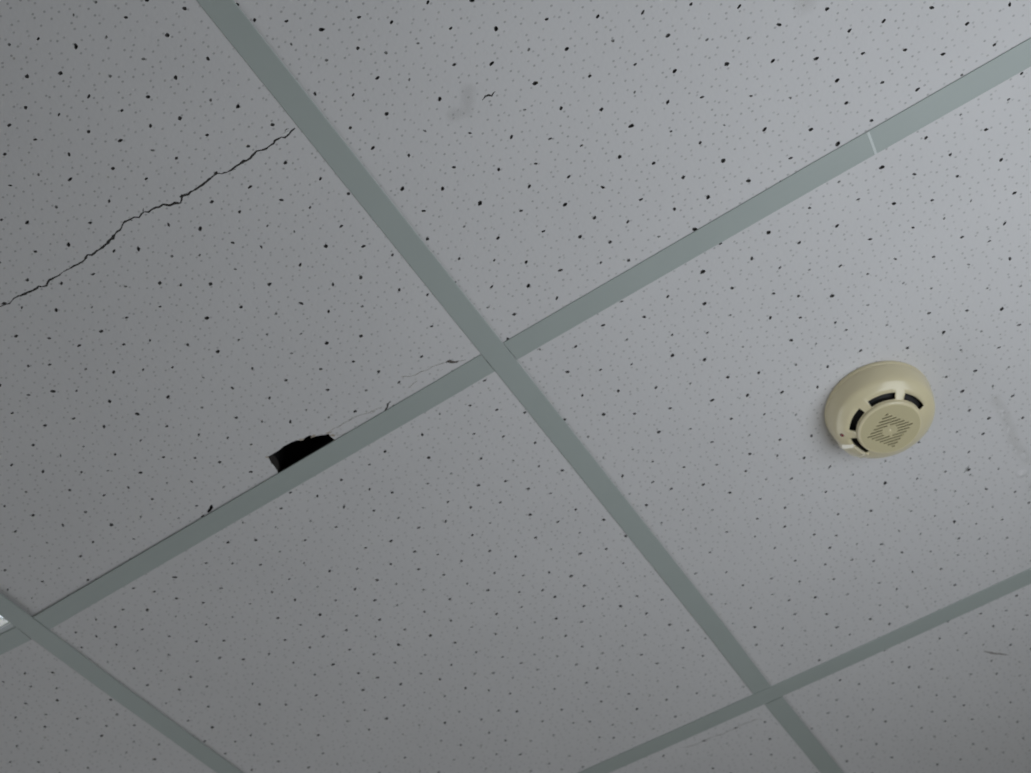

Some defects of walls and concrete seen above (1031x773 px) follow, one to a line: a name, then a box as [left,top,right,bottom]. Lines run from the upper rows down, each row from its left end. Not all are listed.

crack [0,128,295,307]
spalling [266,432,335,473]